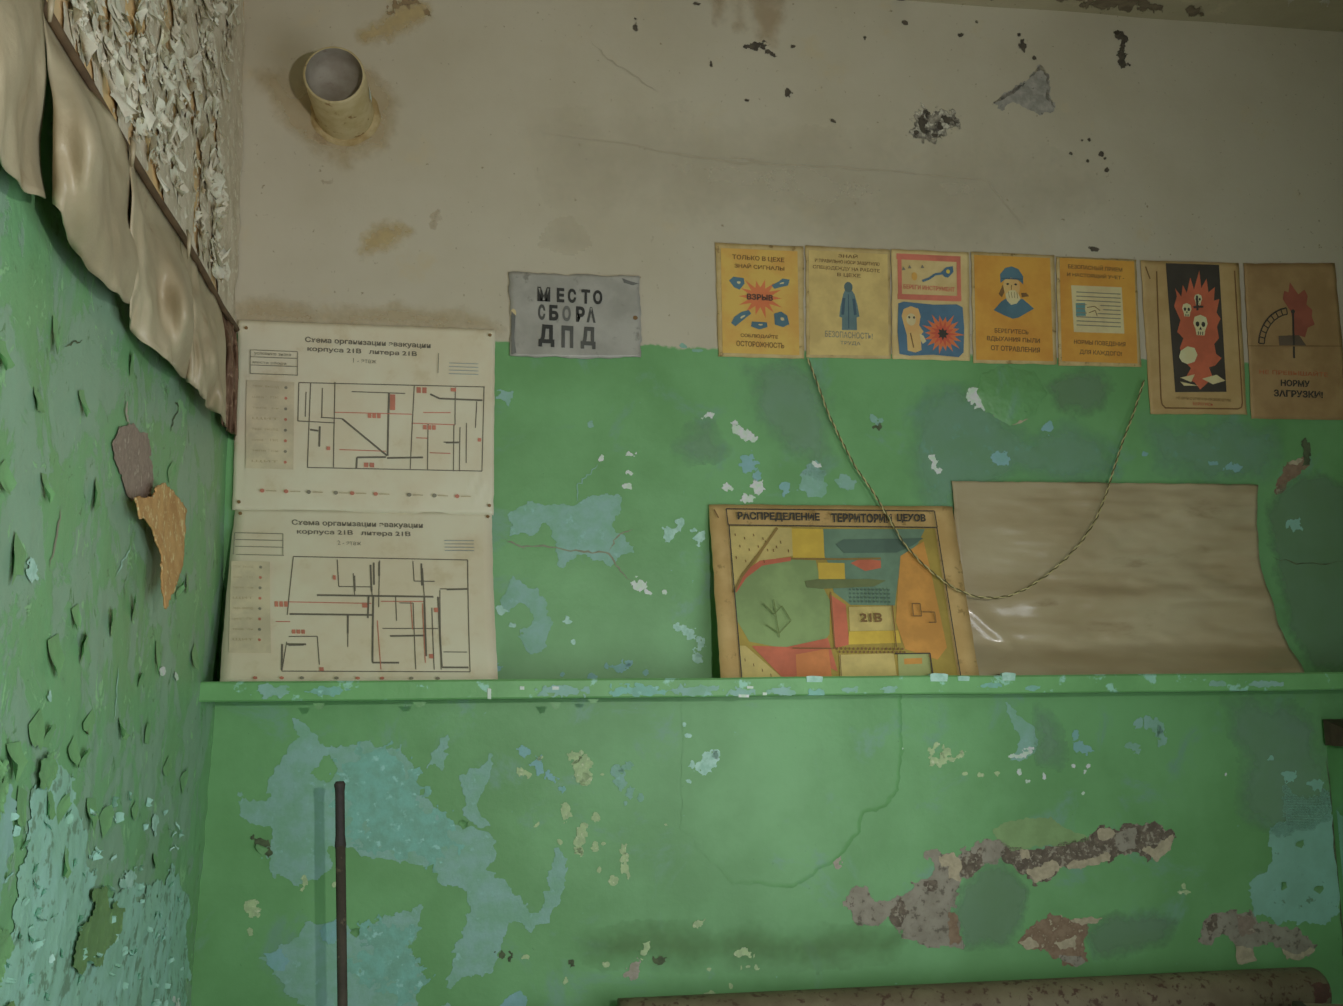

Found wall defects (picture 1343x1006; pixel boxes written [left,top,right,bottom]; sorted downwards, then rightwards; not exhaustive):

flaking render [993,64,1056,115]
peeling [63,0,246,321]
peeling [112,401,189,609]
flaking render [1274,437,1311,495]
peeling [0,633,192,1006]
peeling [237,718,644,1006]
peeling [734,947,760,970]
flaking render [842,821,1176,950]
flaking render [1018,913,1102,967]